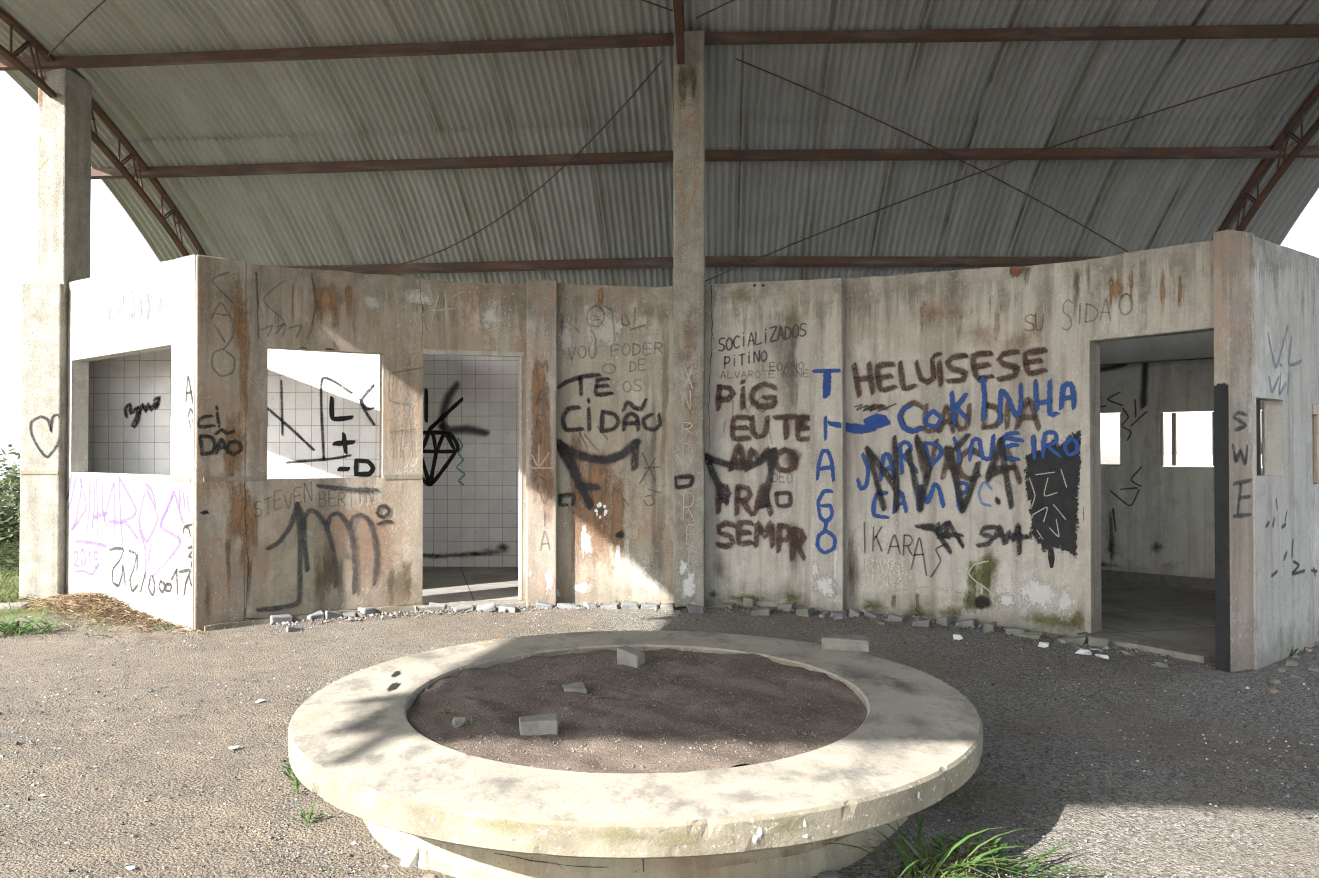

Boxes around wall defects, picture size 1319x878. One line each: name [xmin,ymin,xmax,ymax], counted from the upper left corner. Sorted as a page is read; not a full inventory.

corrosion [1109,275,1133,304]
corrosion [1160,273,1182,303]
corrosion [232,285,250,411]
corrosion [224,421,258,562]
damp [912,555,996,617]